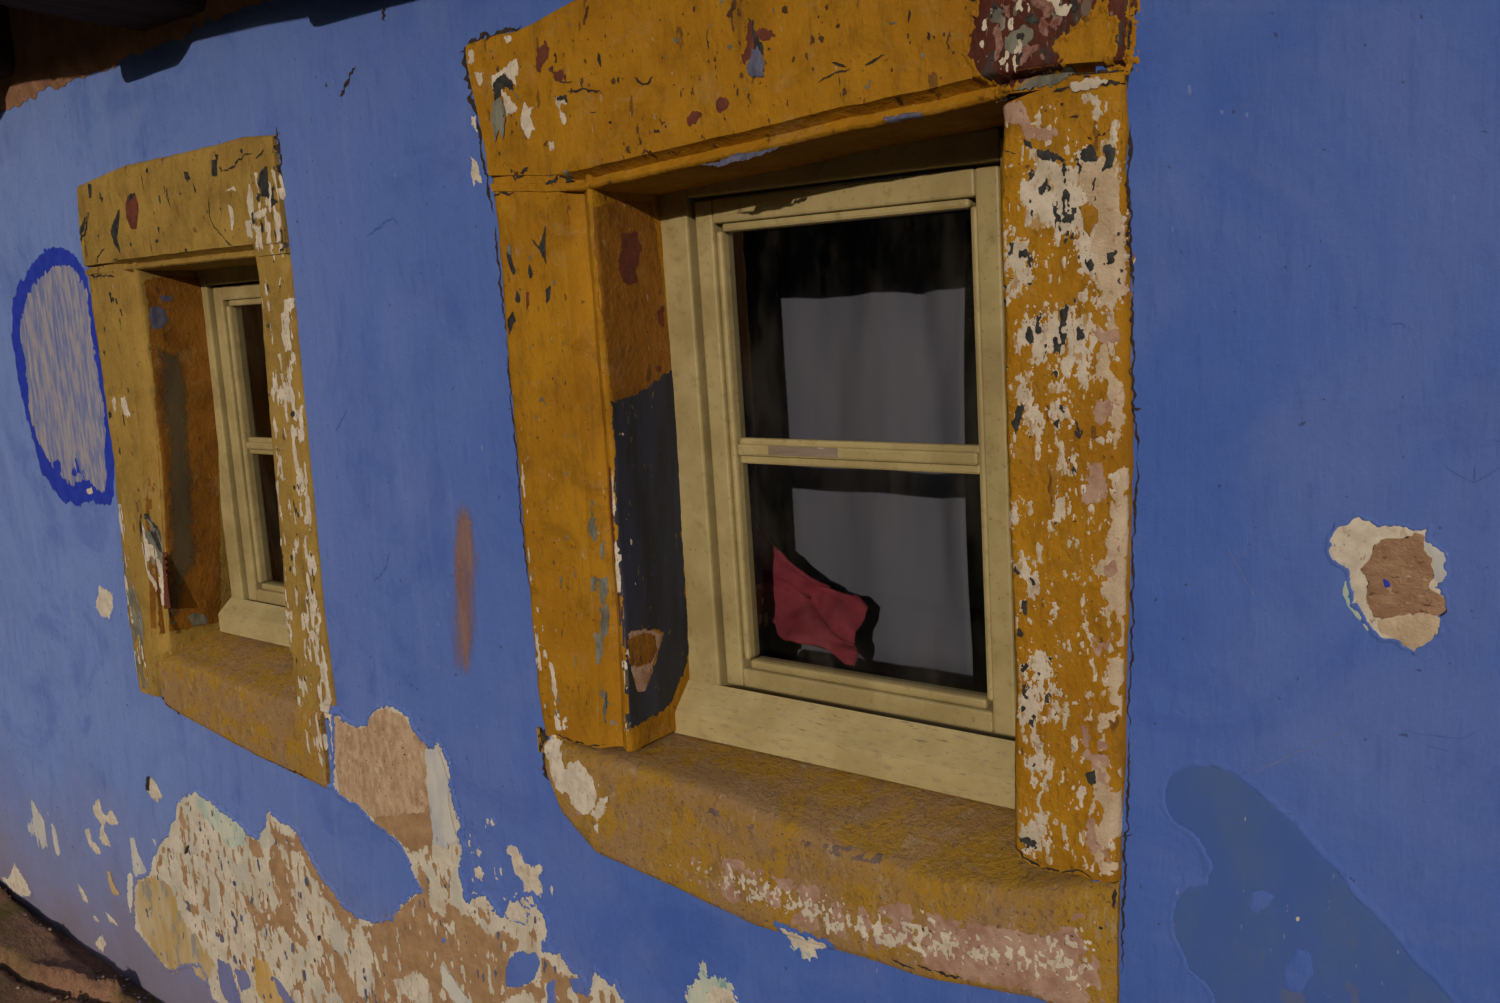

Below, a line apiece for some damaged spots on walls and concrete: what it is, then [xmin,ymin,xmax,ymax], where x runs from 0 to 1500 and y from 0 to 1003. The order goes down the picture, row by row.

spalling [468,5,633,155]
peeling [623,118,674,161]
peeling [883,0,1140,877]
peeling [78,150,631,1003]
spalling [1323,512,1453,657]
peeling [667,852,1105,1003]